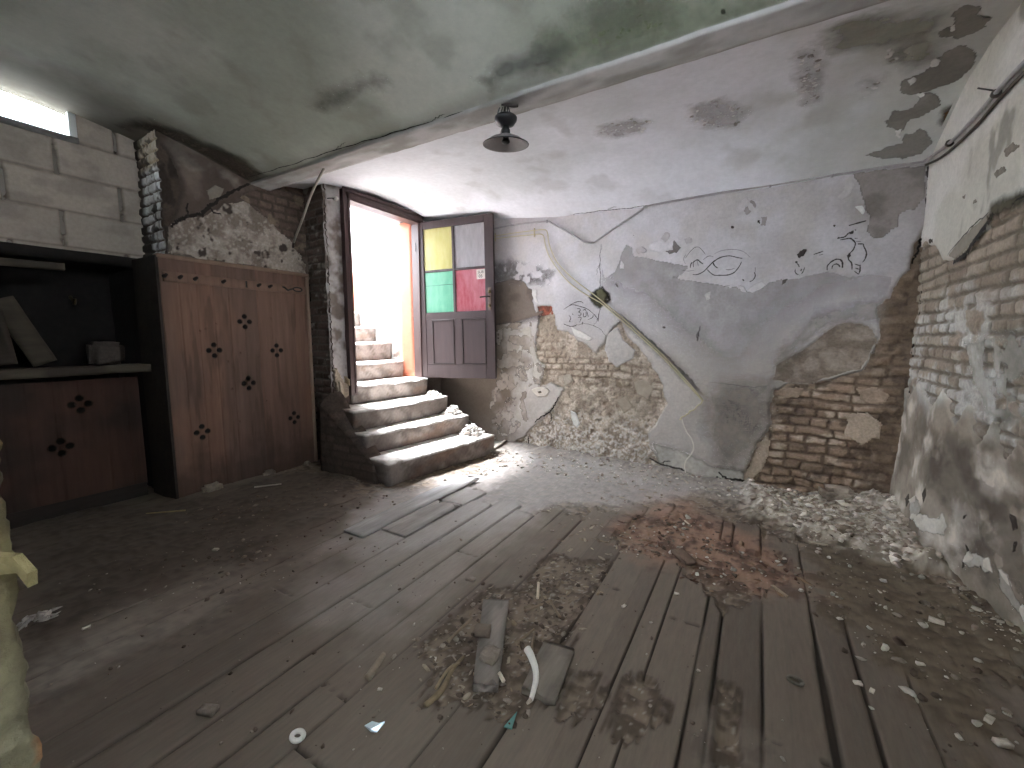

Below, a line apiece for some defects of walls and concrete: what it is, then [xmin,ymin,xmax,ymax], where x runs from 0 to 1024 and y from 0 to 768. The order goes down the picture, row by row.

damp [496,47,561,77]
damp [832,16,939,62]
crack [170,111,462,228]
peeling [838,5,991,238]
spalling [994,142,1020,178]
spalling [157,144,308,274]
spalling [490,279,667,466]
spalling [743,203,1024,494]
peeling [905,487,947,535]
spalling [1009,514,1018,552]
peeling [962,544,1024,622]